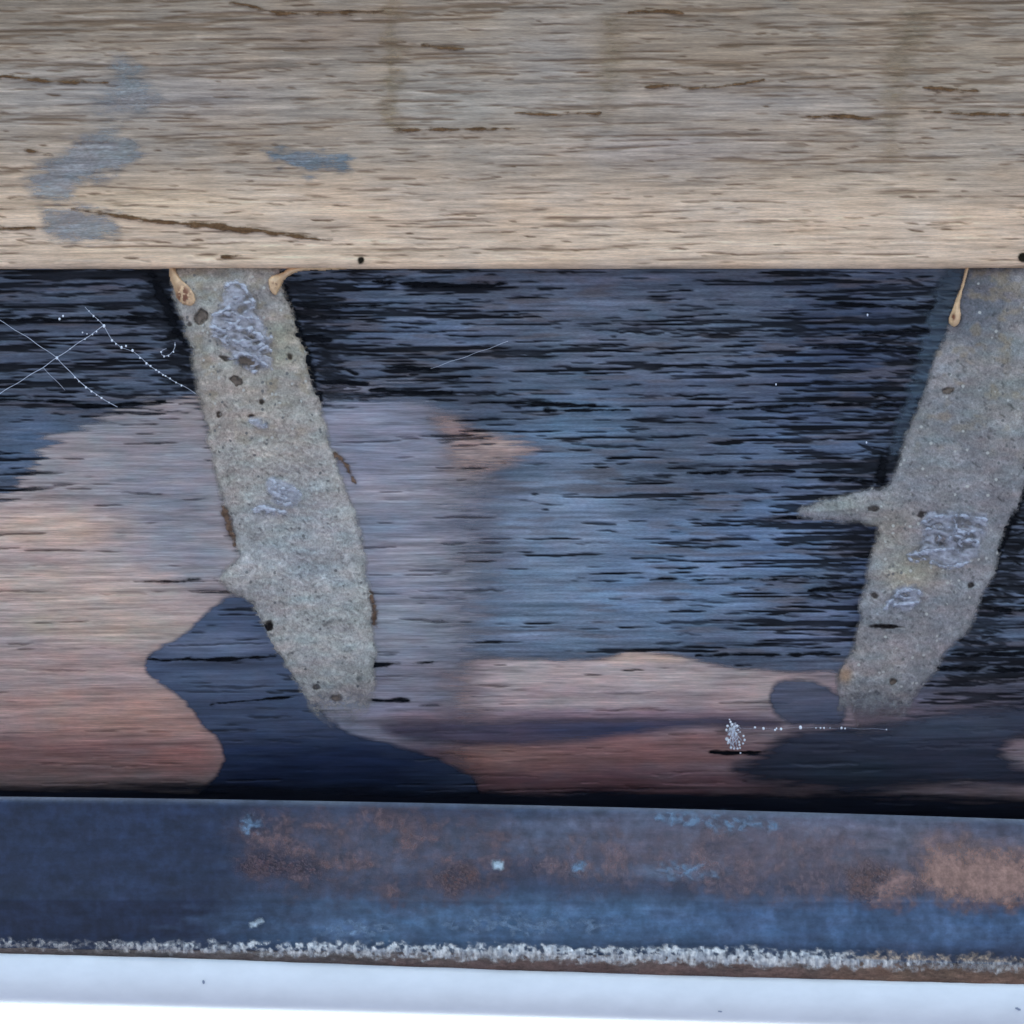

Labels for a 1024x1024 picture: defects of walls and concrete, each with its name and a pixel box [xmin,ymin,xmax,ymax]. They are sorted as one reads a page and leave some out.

damp [28,131,143,241]
damp [267,146,353,177]
corrosion [848,844,1024,910]